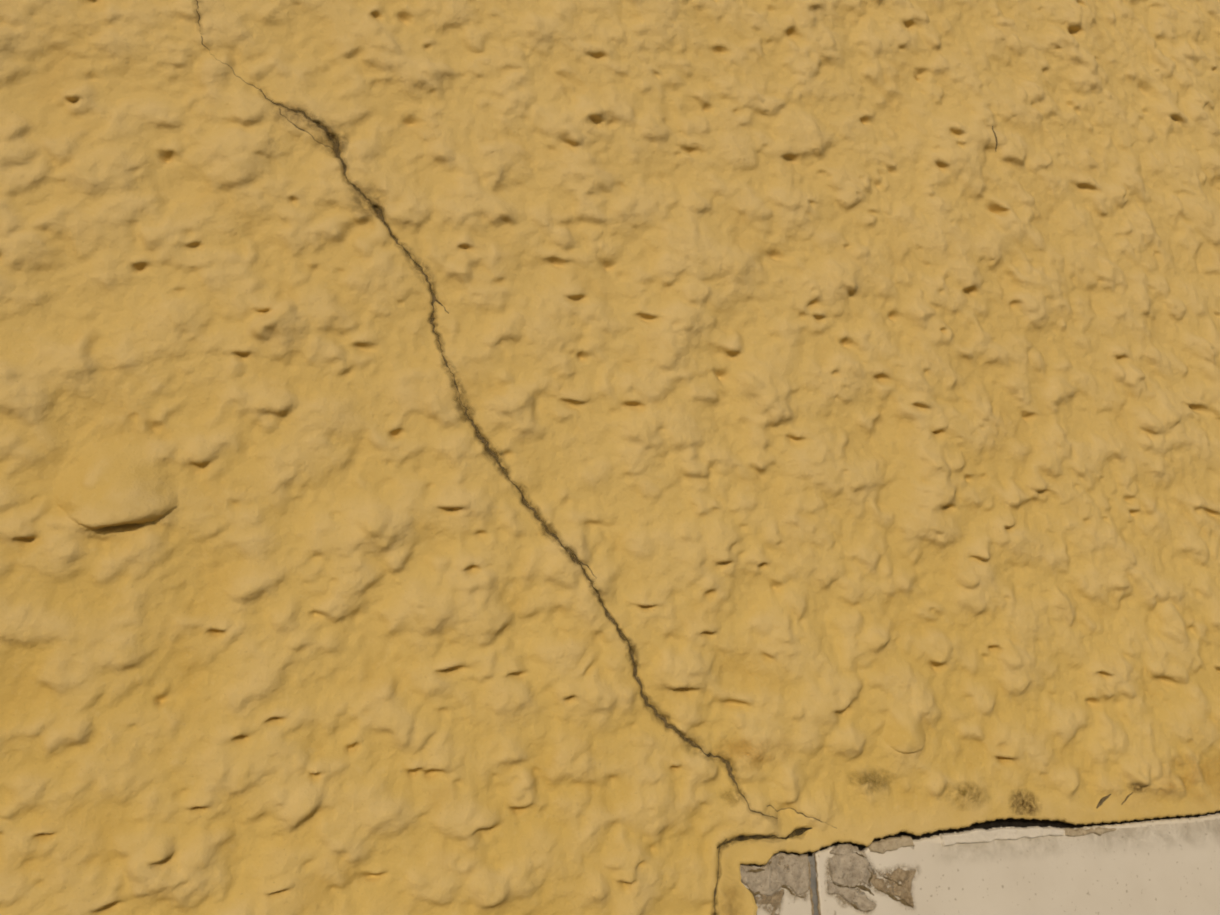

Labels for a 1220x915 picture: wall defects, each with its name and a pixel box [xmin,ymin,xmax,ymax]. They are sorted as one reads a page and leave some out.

crack [196,0,836,915]
peeling [868,835,915,854]
peeling [939,826,1117,846]
spalling [868,867,917,908]